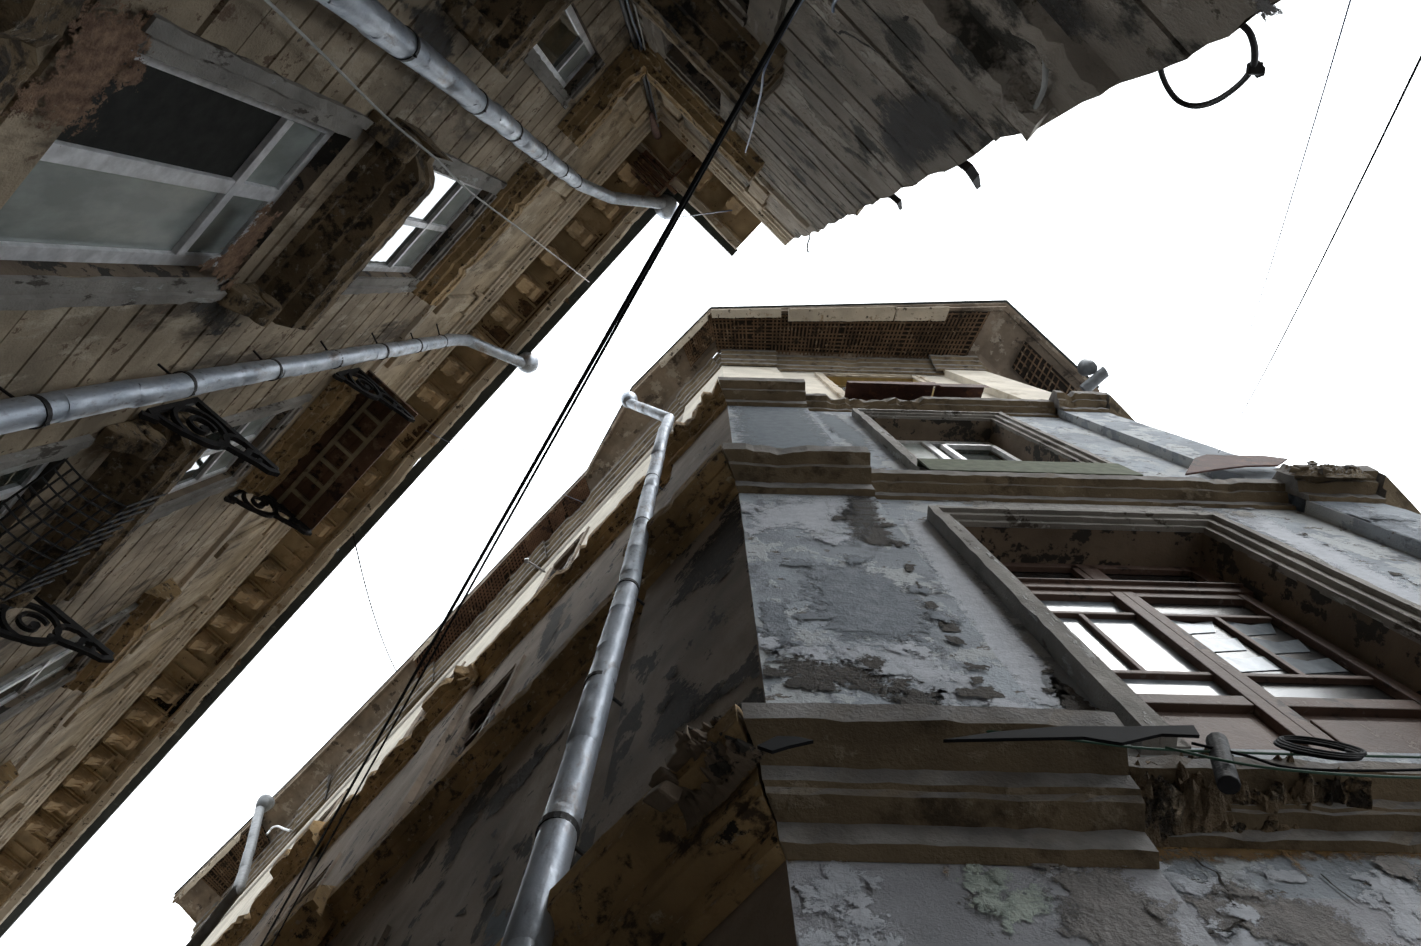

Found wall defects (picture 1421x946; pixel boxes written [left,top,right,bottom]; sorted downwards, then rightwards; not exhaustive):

peeling [700,494,1096,711]
peeling [795,860,905,946]
flaking render [954,855,1421,946]